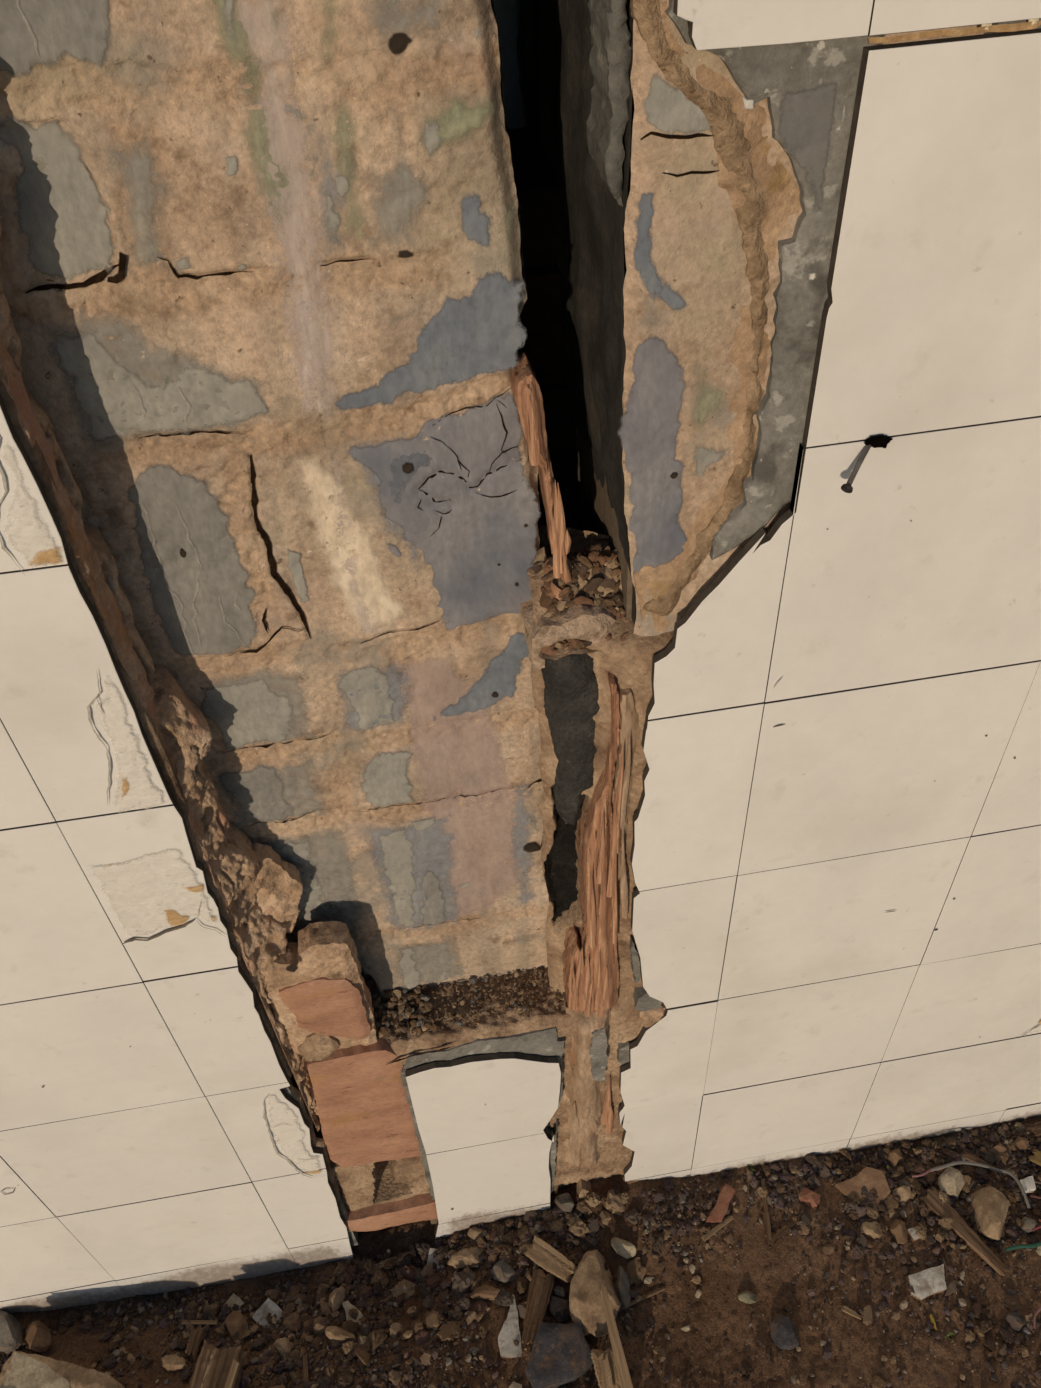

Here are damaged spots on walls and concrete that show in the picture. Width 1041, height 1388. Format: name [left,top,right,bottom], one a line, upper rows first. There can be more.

spalling [388,33,411,54]
crack [640,132,720,177]
crack [26,252,244,294]
crack [320,258,366,266]
crack [417,388,522,537]
crack [138,431,311,657]
spalling [87,670,163,811]
spalling [91,849,224,944]
spalling [523,803,578,921]
peeling [629,935,662,1012]
peeling [589,1024,629,1081]
spalling [263,1095,430,1211]